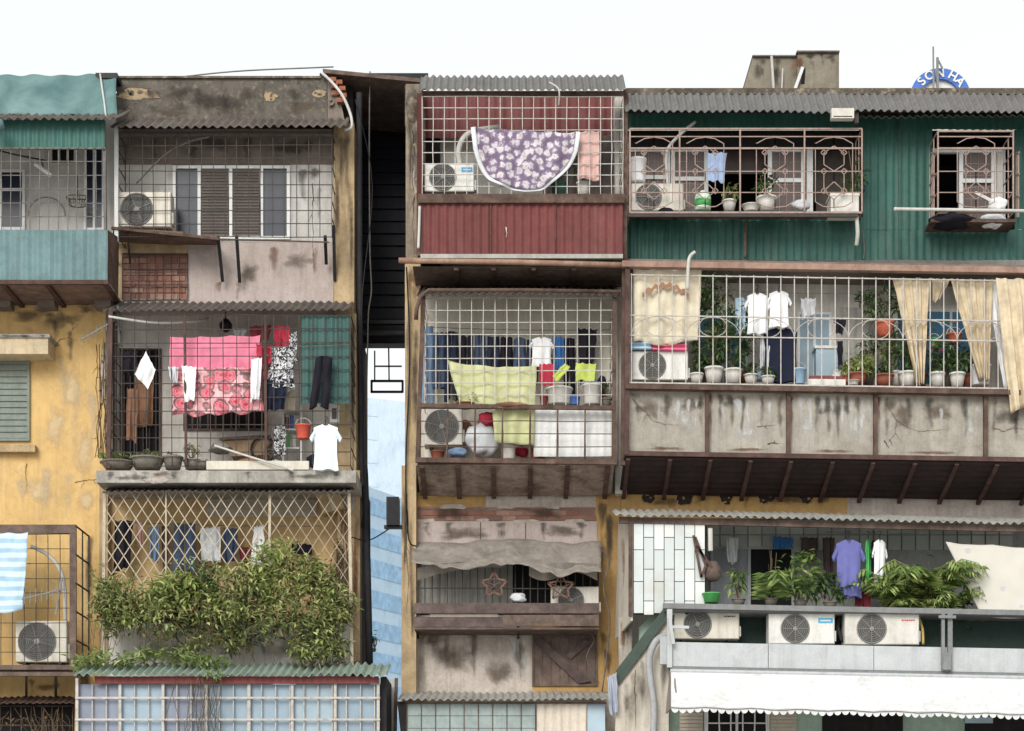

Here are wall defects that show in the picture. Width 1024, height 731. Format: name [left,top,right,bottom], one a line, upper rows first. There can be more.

spalling [116,86,162,101]
spalling [262,90,279,103]
flaking render [310,77,347,106]
leakage [637,397,701,425]
leakage [719,396,753,436]
leakage [798,397,871,433]
leakage [440,511,484,538]
leakage [536,511,583,534]
leakage [428,635,461,667]
leakage [492,636,526,680]